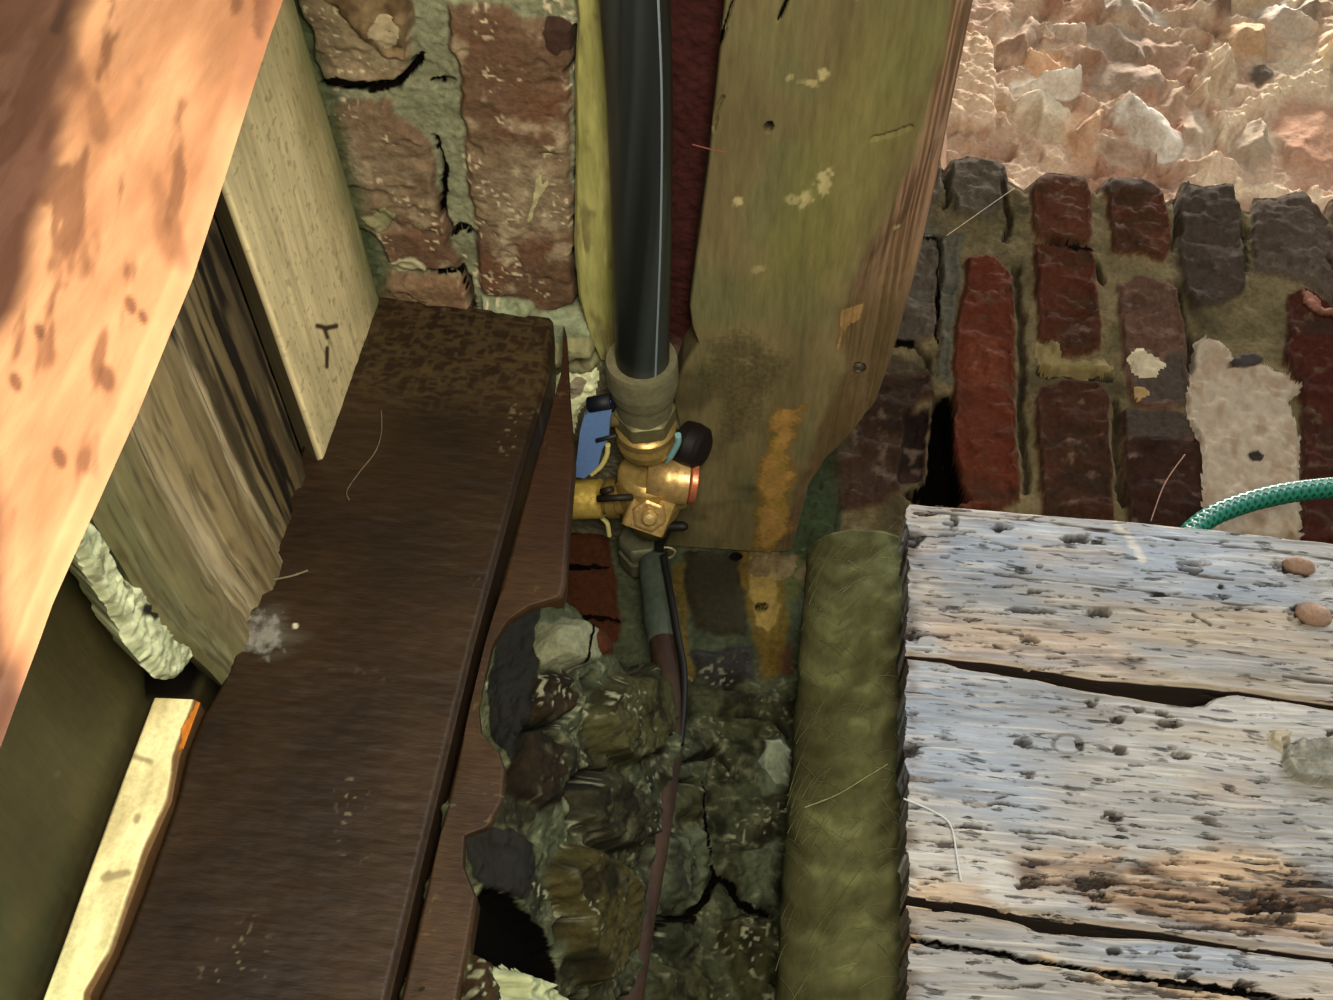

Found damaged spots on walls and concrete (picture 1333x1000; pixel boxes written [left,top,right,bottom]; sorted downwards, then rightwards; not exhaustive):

crack [399,51,426,80]
crack [436,135,472,290]
spalling [1230,353,1263,367]